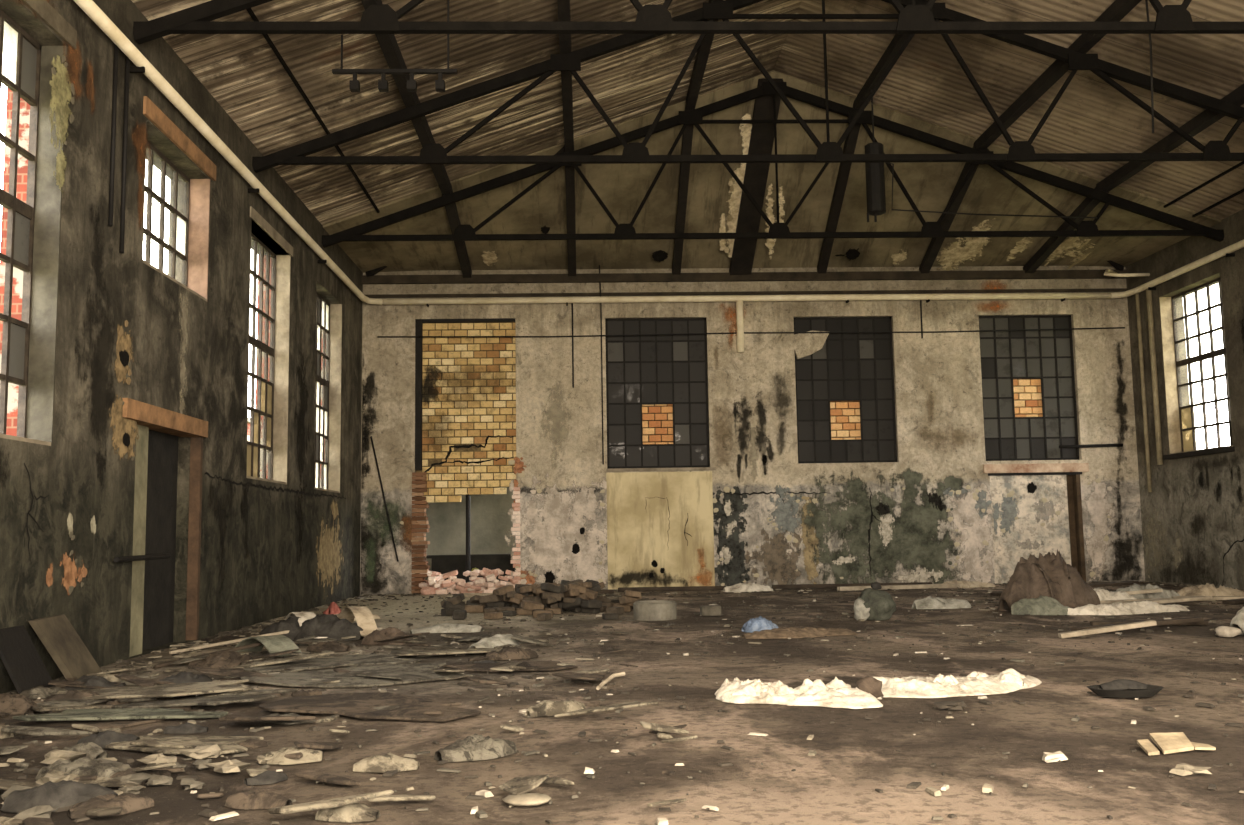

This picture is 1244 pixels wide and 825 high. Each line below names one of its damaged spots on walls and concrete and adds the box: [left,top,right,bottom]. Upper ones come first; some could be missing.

water stain [733,376,790,478]
water stain [97,456,106,484]
crack [425,435,514,472]
water stain [1197,456,1242,502]
peeling [713,468,1061,586]
spalling [46,512,87,595]
water stain [1164,547,1217,585]